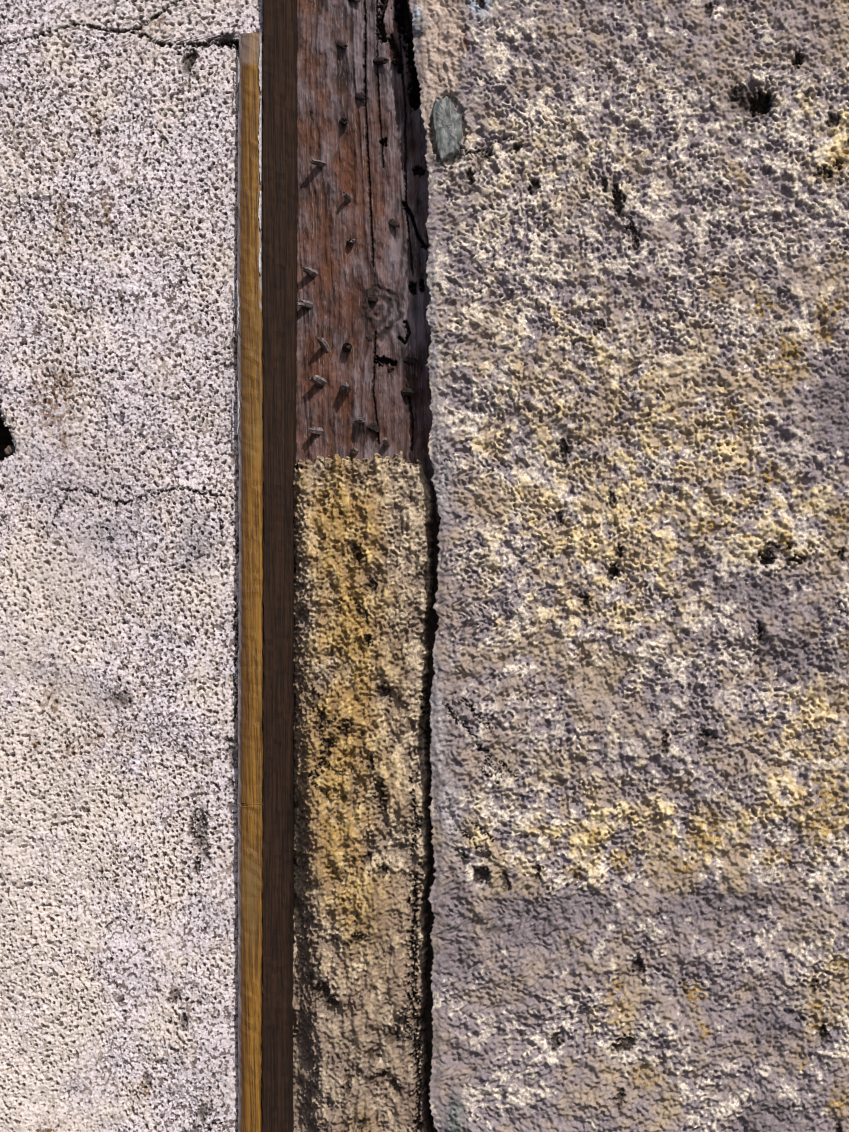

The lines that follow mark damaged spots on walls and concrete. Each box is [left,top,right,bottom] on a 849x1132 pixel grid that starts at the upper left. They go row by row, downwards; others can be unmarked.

crack [0,0,238,48]